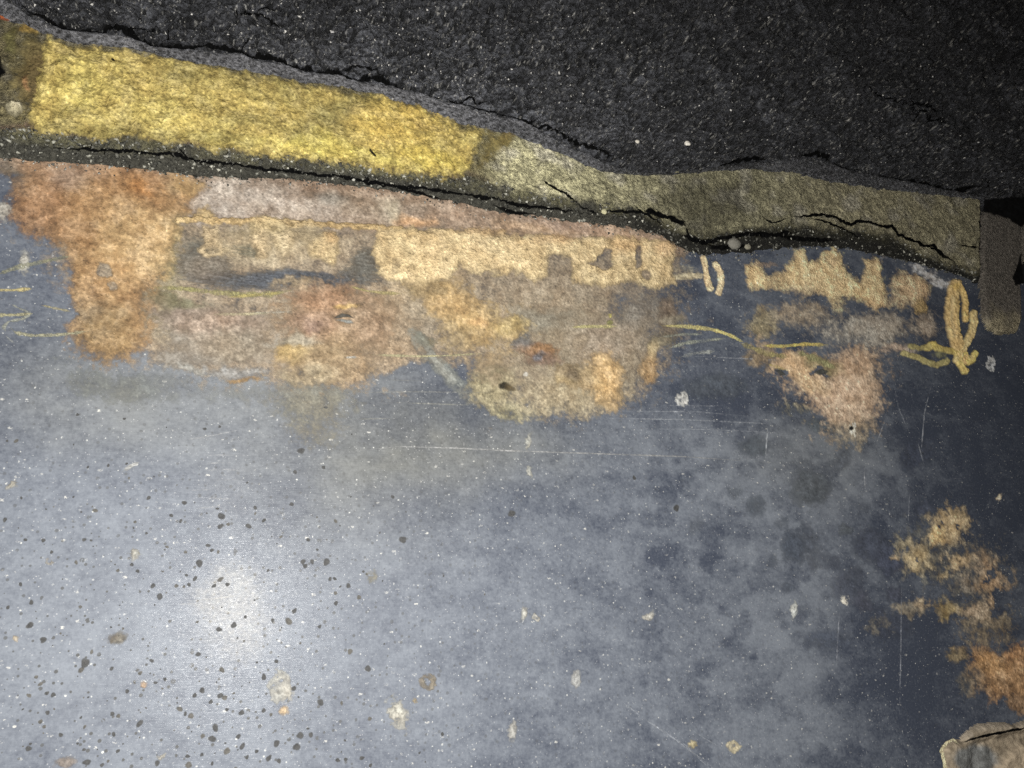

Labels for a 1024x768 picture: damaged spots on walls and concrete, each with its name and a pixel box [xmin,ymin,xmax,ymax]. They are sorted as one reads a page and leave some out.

crack [428,94,614,158]
rust [2,158,213,364]
crack [54,147,977,261]
rust [273,275,396,388]
rust [410,281,624,411]
rust [640,300,682,383]
rust [745,343,912,440]
rust [891,507,1024,715]